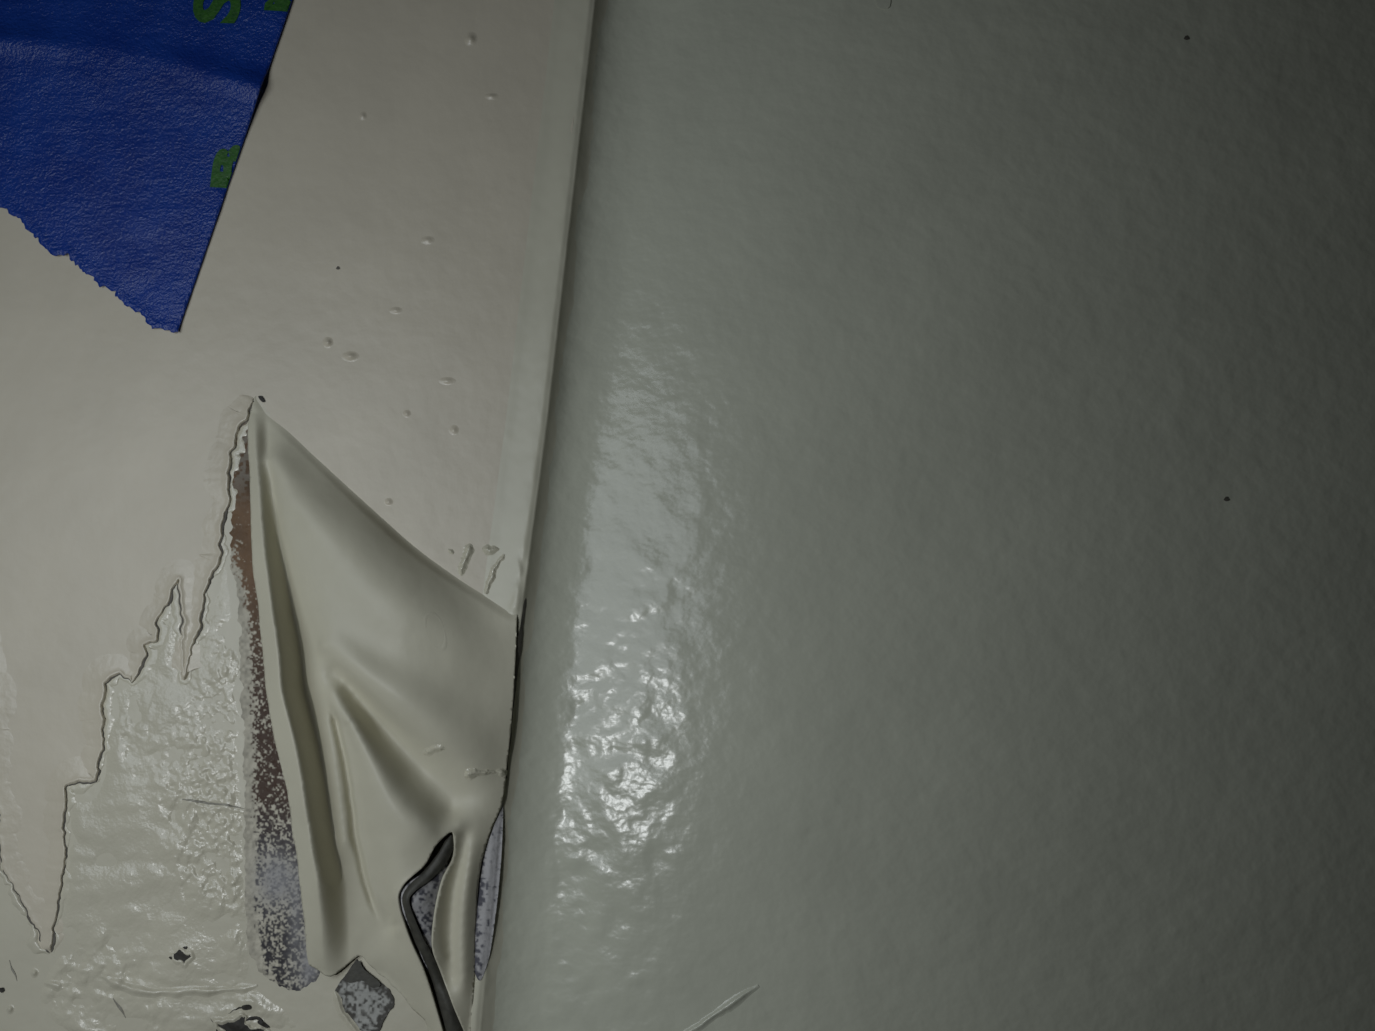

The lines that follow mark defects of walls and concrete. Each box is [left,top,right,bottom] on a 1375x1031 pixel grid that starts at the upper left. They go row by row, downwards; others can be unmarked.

peeling [229,396,518,1031]
peeling [169,946,196,969]
peeling [210,1005,271,1031]